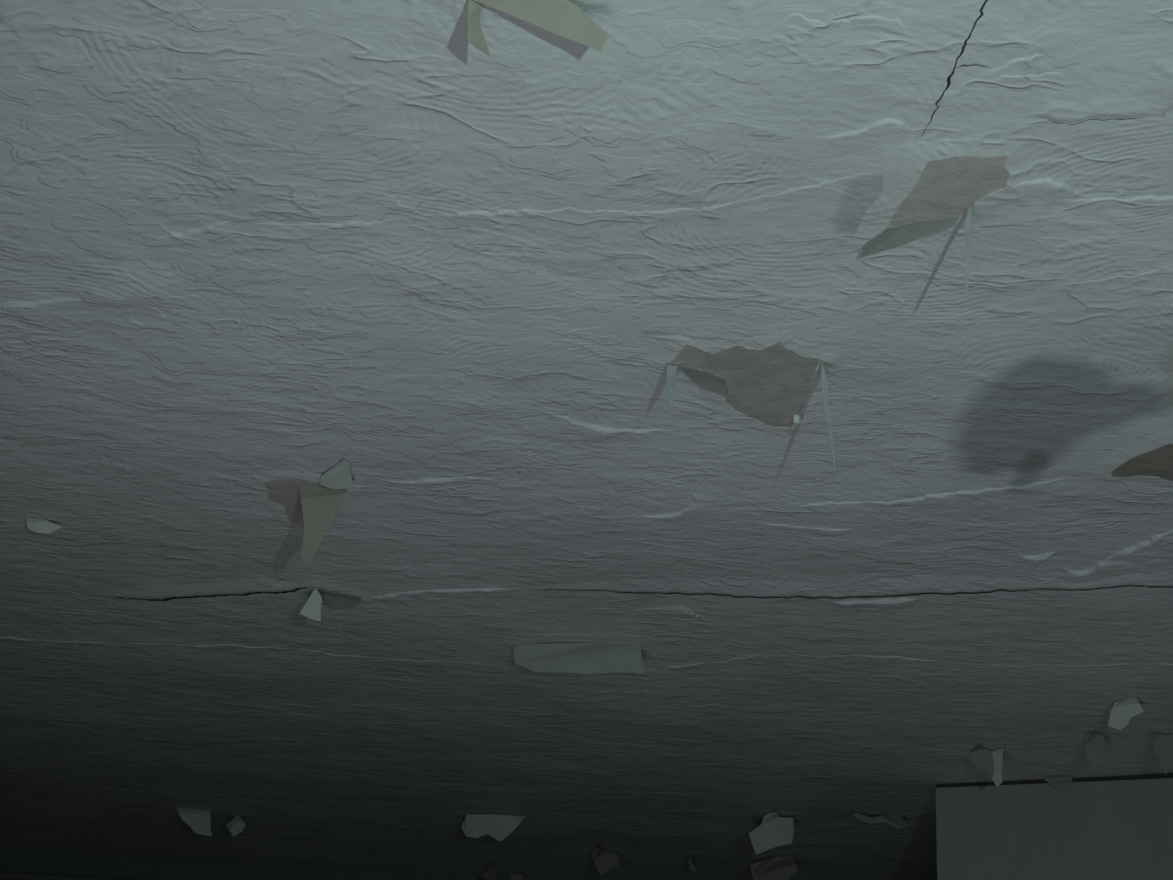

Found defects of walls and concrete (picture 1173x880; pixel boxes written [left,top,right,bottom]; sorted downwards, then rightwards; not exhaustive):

peeling [418,0,609,56]
crack [238,0,1064,238]
peeling [837,136,1045,297]
peeling [640,329,847,474]
peeling [1088,429,1173,489]
peeling [299,581,377,622]
peeling [499,632,659,674]
peeling [1108,697,1144,730]
peeling [991,748,1004,787]
peeling [175,807,212,837]
peeling [462,814,526,841]
peeling [749,810,798,880]